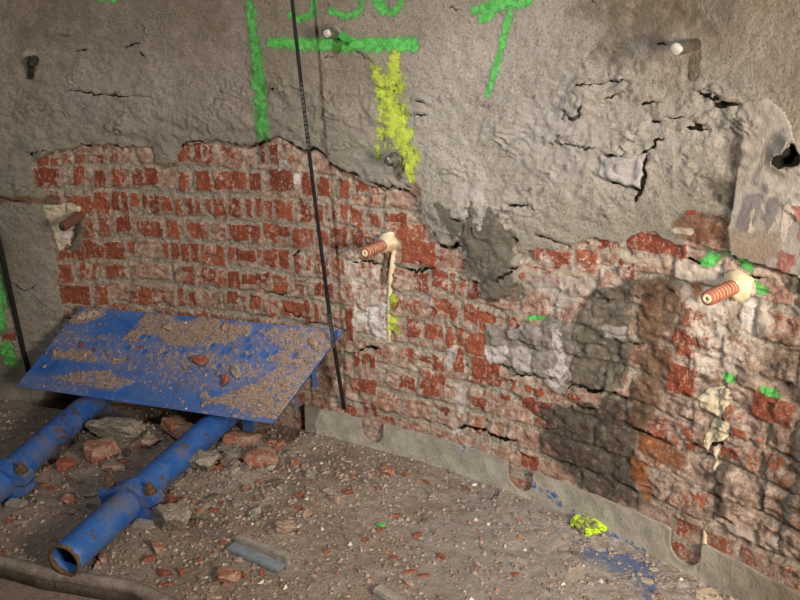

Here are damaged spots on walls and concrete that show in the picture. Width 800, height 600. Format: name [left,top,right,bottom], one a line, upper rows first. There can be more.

crack [66,89,142,98]
crack [561,79,628,122]
crack [556,92,739,202]
spalling [31,136,800,593]
leakage [703,421,800,561]